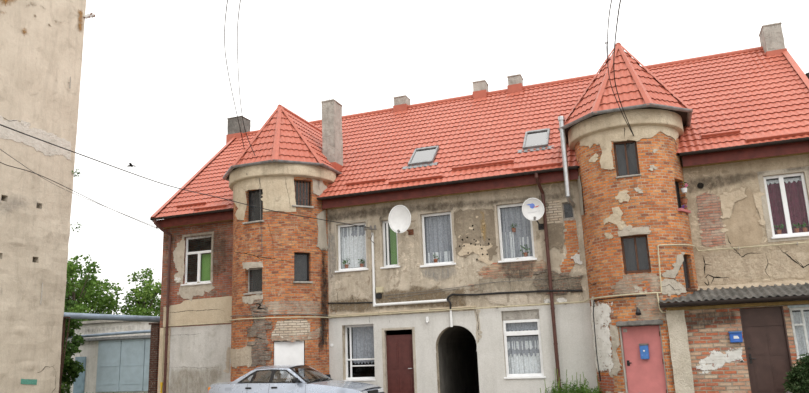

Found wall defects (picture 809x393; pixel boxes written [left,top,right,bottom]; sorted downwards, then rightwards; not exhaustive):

spalling [0,115,72,160]
peeling [173,240,187,297]
peeling [454,200,583,306]
peeling [604,187,651,239]
peeling [634,252,685,296]
spalling [696,187,768,285]
crack [728,239,809,275]
spalling [223,294,316,373]
peeling [590,285,623,393]
peeling [696,347,744,374]